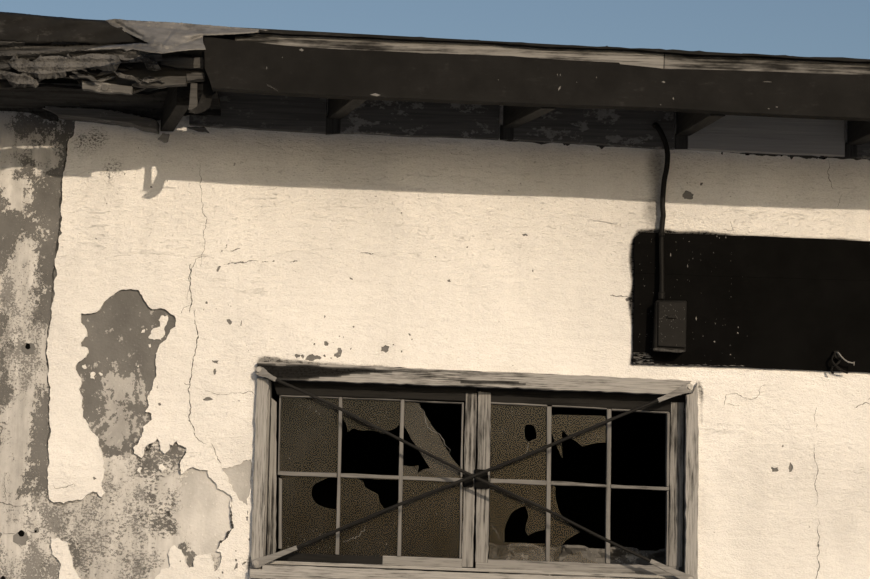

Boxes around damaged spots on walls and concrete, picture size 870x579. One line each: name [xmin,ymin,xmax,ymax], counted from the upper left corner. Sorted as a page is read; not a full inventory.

peeling [0,296,36,446]
peeling [0,112,75,326]
peeling [13,289,253,579]
crack [181,176,256,463]
crack [813,448,821,578]